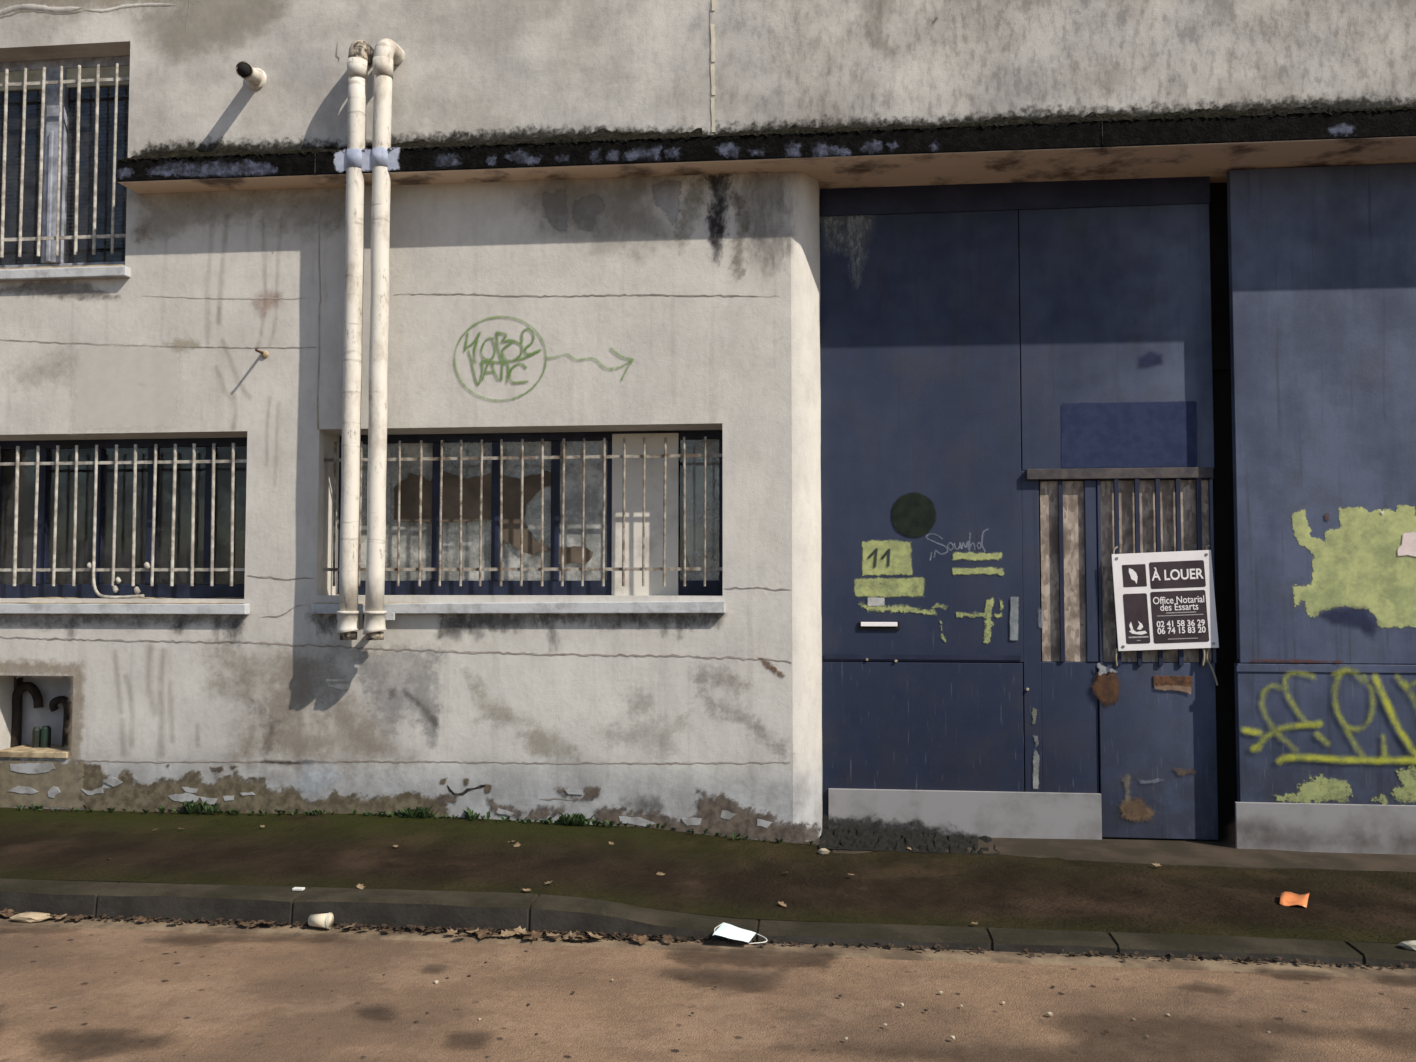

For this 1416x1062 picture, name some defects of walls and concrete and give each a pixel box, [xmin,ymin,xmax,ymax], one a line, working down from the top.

water stain [705,174,789,263]
corrosion [1093,672,1119,706]
peeling [0,758,458,817]
peeling [487,786,826,845]